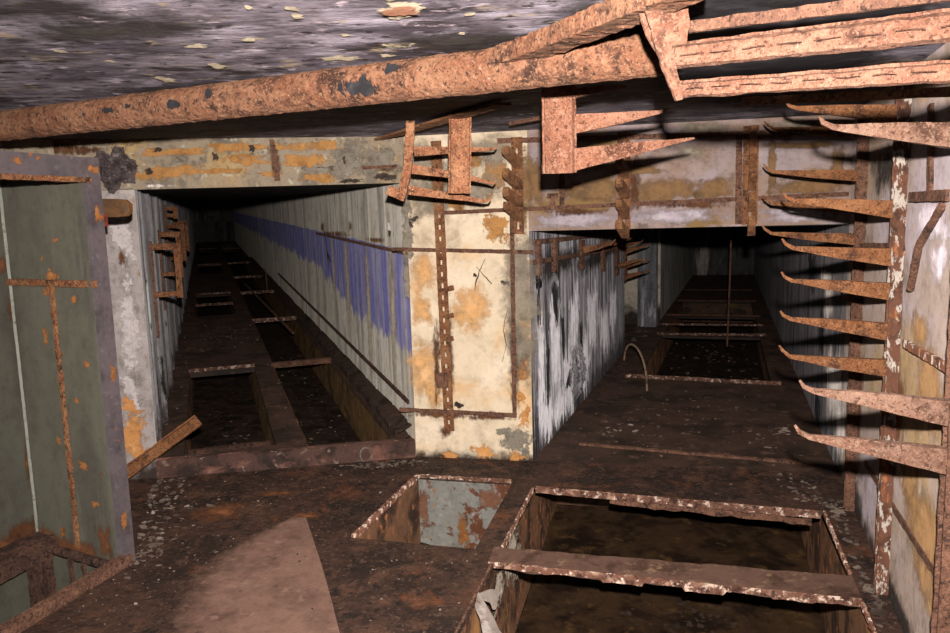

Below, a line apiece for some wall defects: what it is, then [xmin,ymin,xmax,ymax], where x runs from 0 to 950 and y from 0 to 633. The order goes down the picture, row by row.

corrosion [337,72,380,97]
corrosion [382,63,399,74]
peeling [131,140,402,183]
water stain [505,239,615,377]
peeling [109,217,160,458]
corrosion [416,321,504,437]
corrosion [895,415,904,441]
corrosion [0,516,113,556]
corrosion [419,490,429,530]
corrosion [457,512,472,548]
corrosion [479,487,502,511]